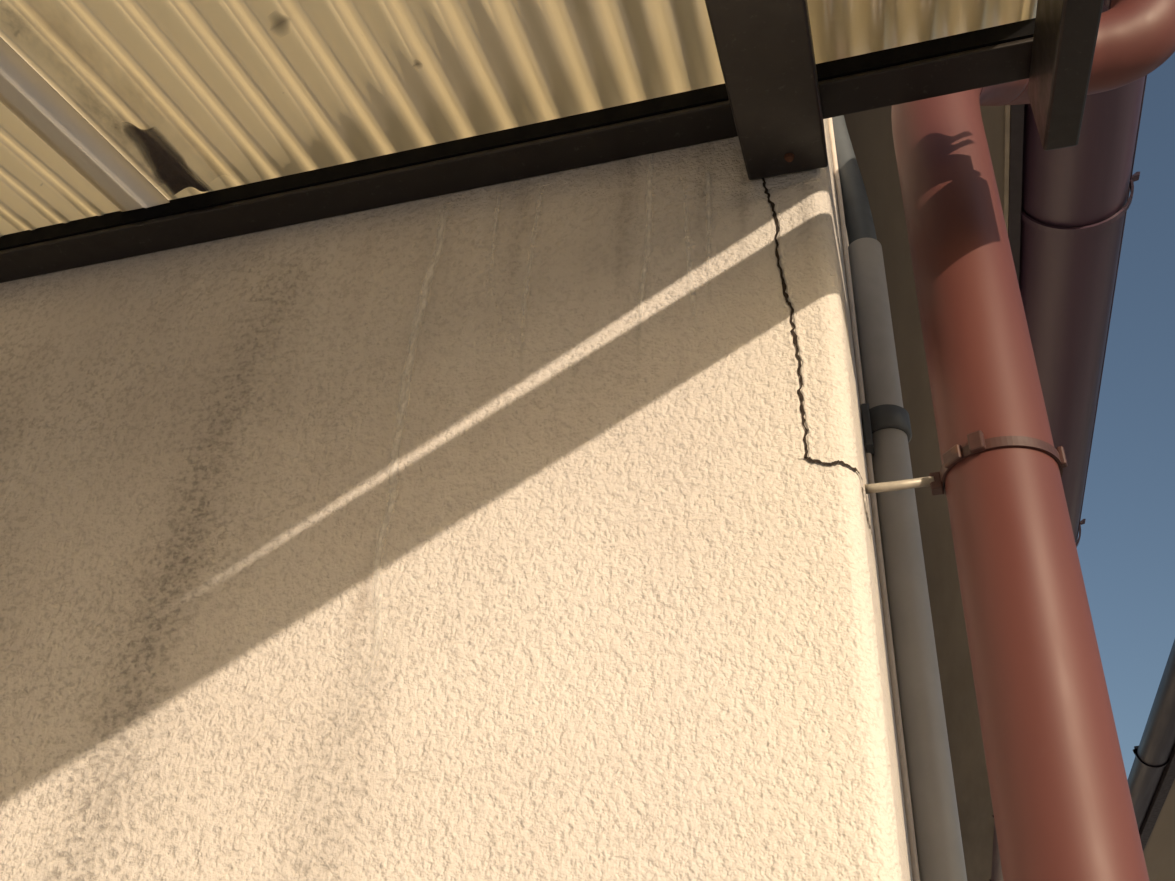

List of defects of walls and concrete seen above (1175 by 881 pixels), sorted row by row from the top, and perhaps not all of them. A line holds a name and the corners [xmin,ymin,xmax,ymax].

crack [761,178,878,570]